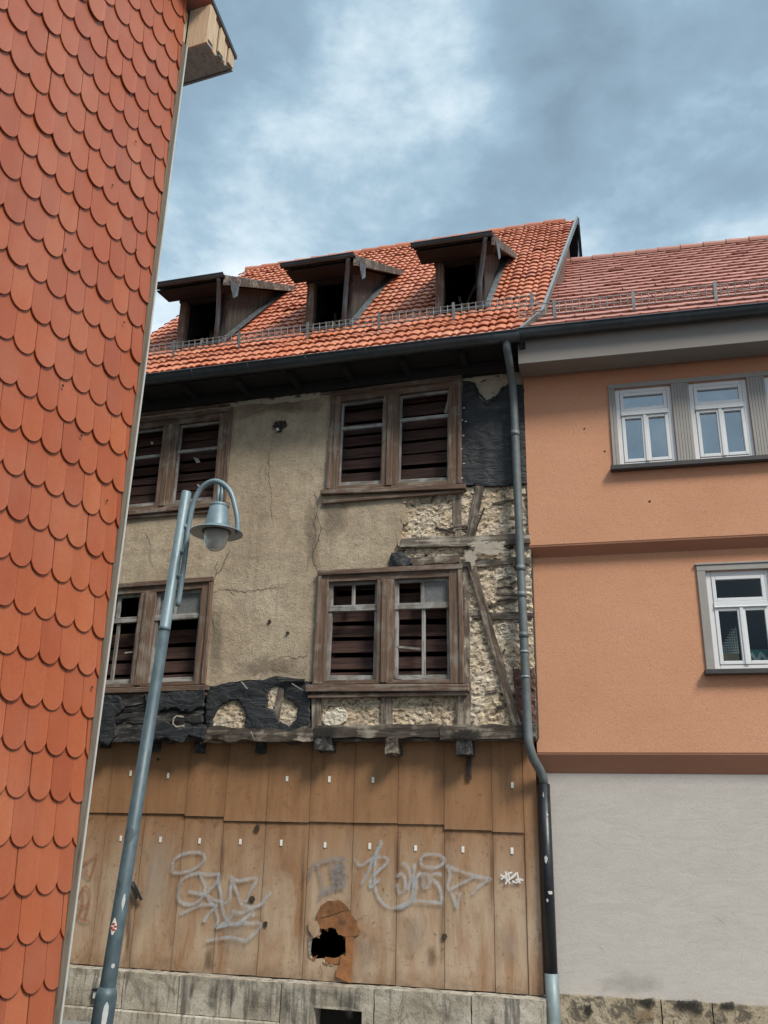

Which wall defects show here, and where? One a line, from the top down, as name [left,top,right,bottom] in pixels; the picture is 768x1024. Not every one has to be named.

spalling [463,372,524,401]
crack [307,494,322,571]
crack [214,548,284,596]
spalling [388,485,537,726]
spalling [213,700,247,728]
spalling [268,685,299,726]
spalling [322,693,456,726]
spalling [308,900,360,983]
water stain [635,998,656,1009]
water stain [672,999,704,1014]